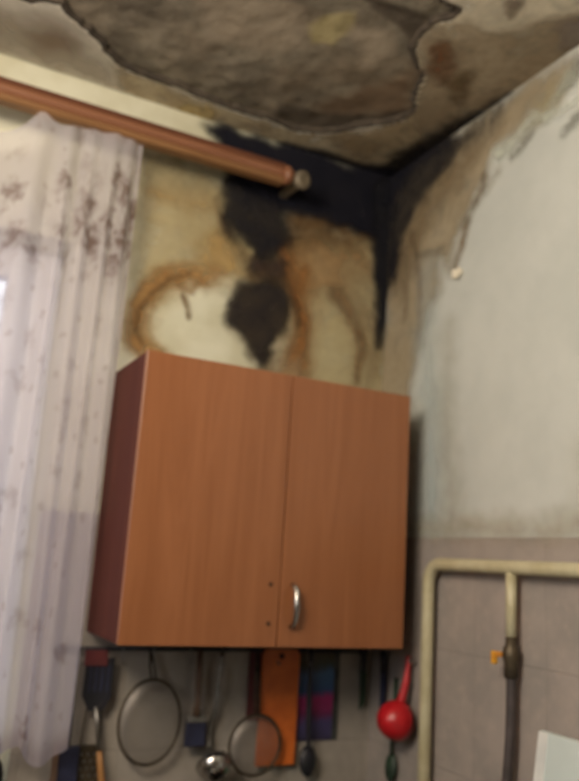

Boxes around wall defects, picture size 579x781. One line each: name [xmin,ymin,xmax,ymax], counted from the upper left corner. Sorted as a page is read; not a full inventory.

flaking render [22,0,579,146]
damp [118,60,579,396]
corrosion [128,266,216,355]